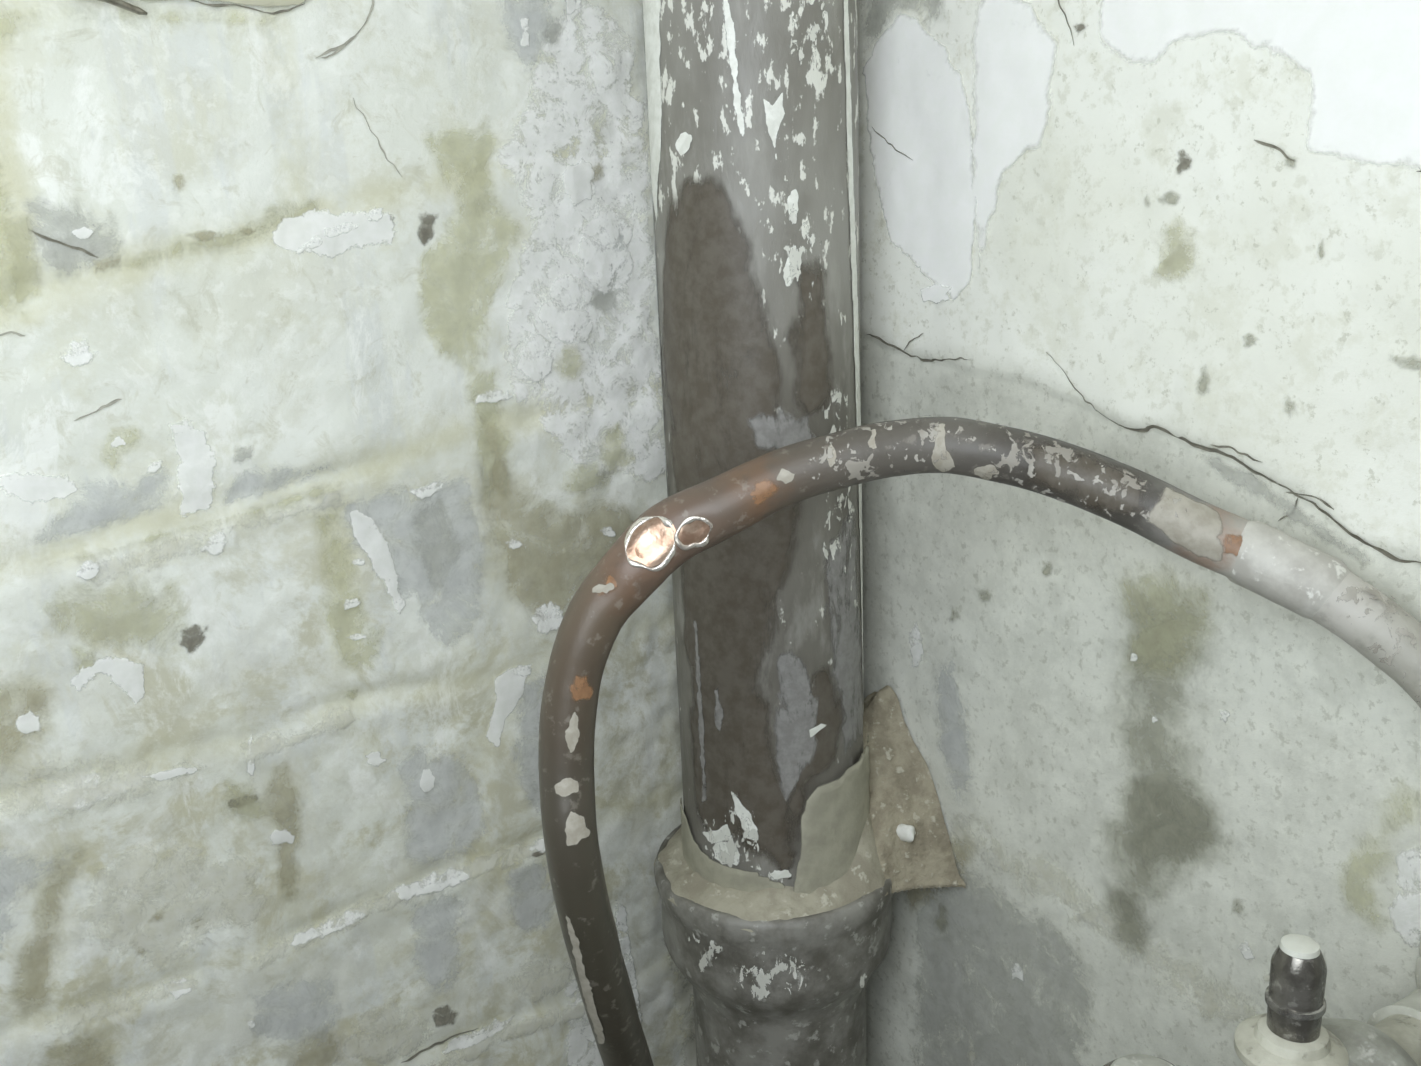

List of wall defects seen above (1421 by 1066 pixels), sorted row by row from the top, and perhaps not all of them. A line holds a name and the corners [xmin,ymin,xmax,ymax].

peeling [476,0,666,491]
crack [867,333,967,362]
peeling [345,482,481,642]
damp [478,378,633,634]
crack [1046,352,1421,563]
damp [0,690,45,751]
peeling [71,657,145,703]
spalling [181,625,205,652]
damp [1114,586,1214,950]
damp [233,773,297,884]
damp [21,884,60,1003]
spalling [401,1005,478,1063]